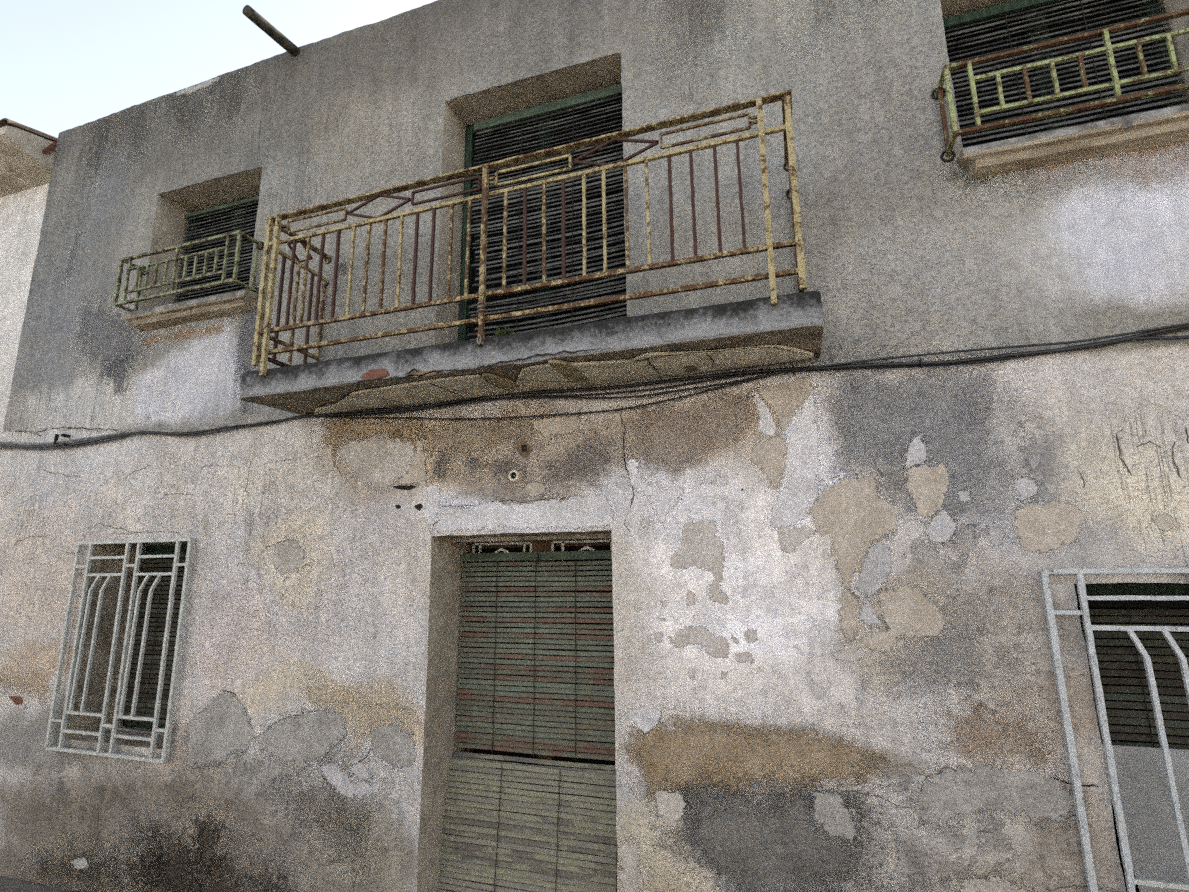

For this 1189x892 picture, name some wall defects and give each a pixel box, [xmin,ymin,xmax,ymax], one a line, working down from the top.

leakage [548,439,611,480]
leakage [640,394,754,475]
peeling [750,377,947,653]
peeling [903,436,971,543]
peeling [1013,477,1085,554]
peeling [319,761,381,799]
leakage [625,717,880,892]